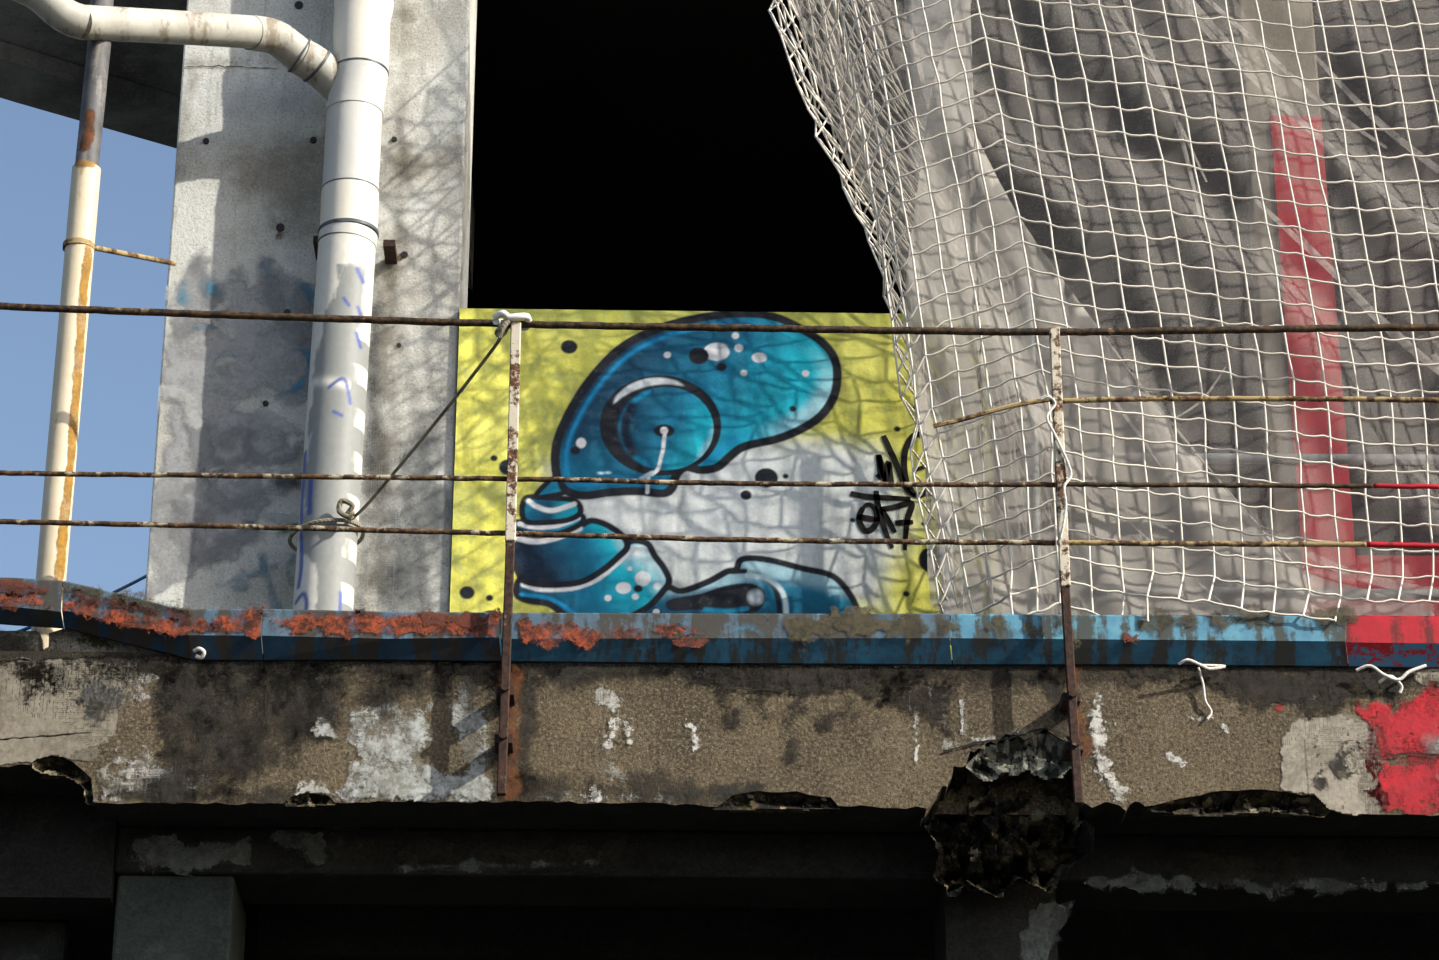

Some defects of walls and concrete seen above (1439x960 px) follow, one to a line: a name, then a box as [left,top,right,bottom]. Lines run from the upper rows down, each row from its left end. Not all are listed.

corrosion [0,245,710,651]
spalling [32,758,96,805]
peeling [131,830,328,877]
peeling [285,680,495,807]
corrosion [498,665,523,800]
damp [0,629,1069,806]
spalling [920,730,1094,960]
damp [1088,695,1142,802]
damp [1115,665,1414,721]